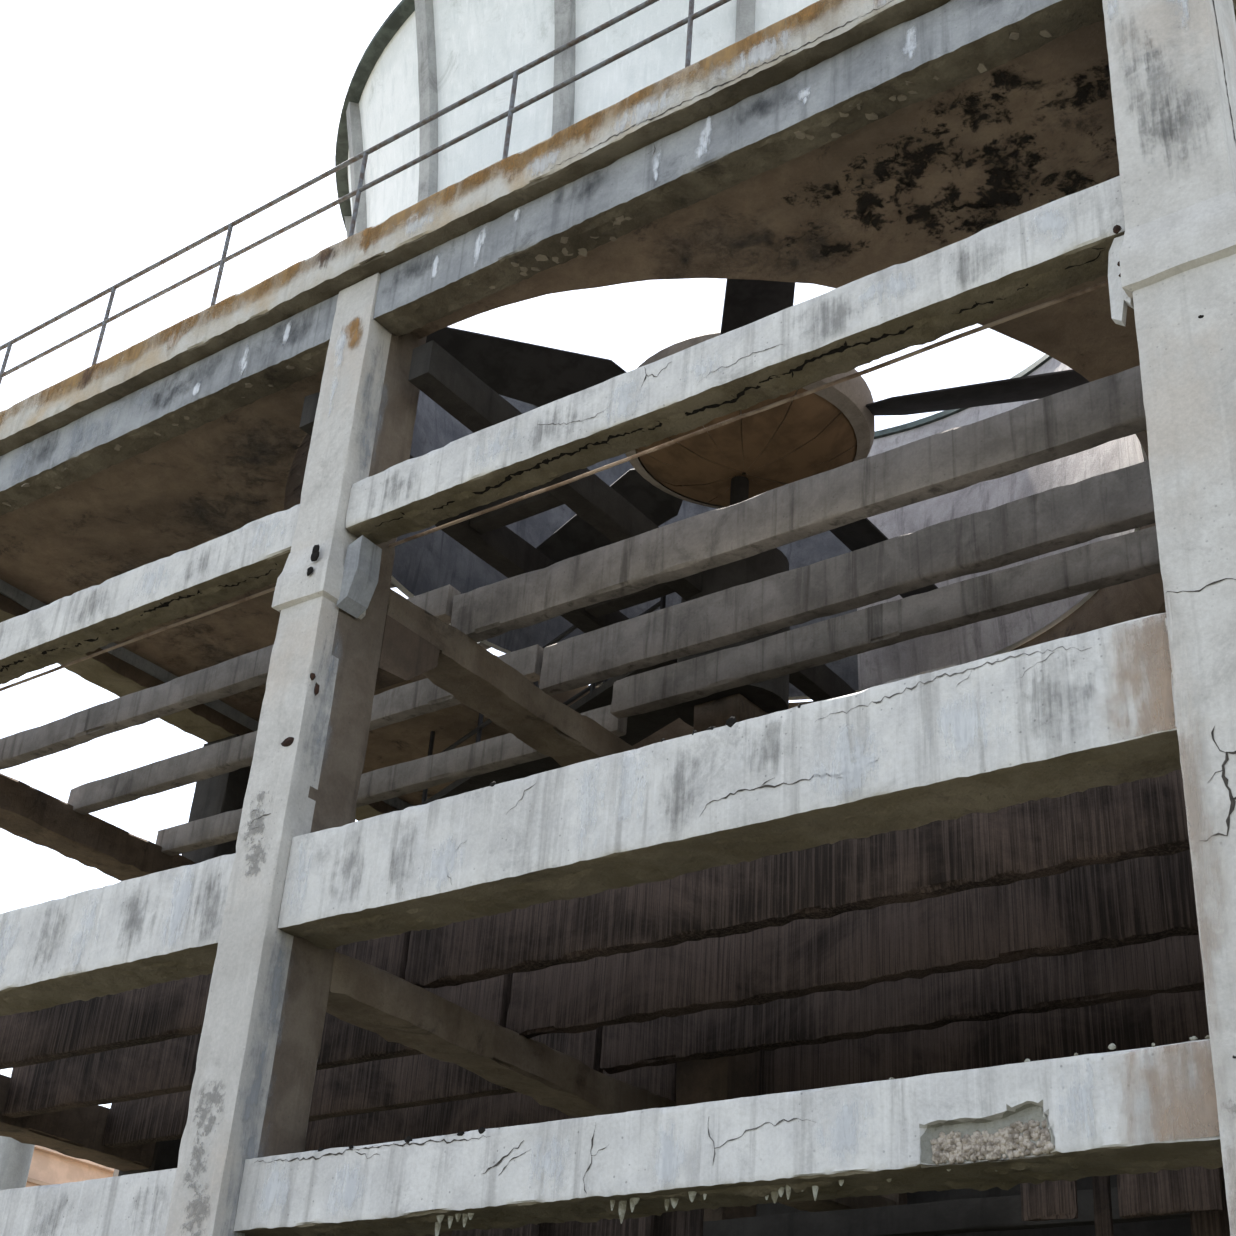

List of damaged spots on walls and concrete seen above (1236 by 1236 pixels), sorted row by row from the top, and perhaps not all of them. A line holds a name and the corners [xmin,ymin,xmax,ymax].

rust [44,0,837,399]
crack [379,325,914,526]
crack [1167,578,1236,593]
crack [701,773,842,814]
crack [1199,726,1236,842]
crack [708,1118,814,1163]
spalling [909,1103,1223,1193]
water stain [435,1213,474,1236]
spalling [252,1180,881,1236]
water stain [610,1198,640,1224]
water stain [665,1191,707,1211]
water stain [765,1185,818,1203]